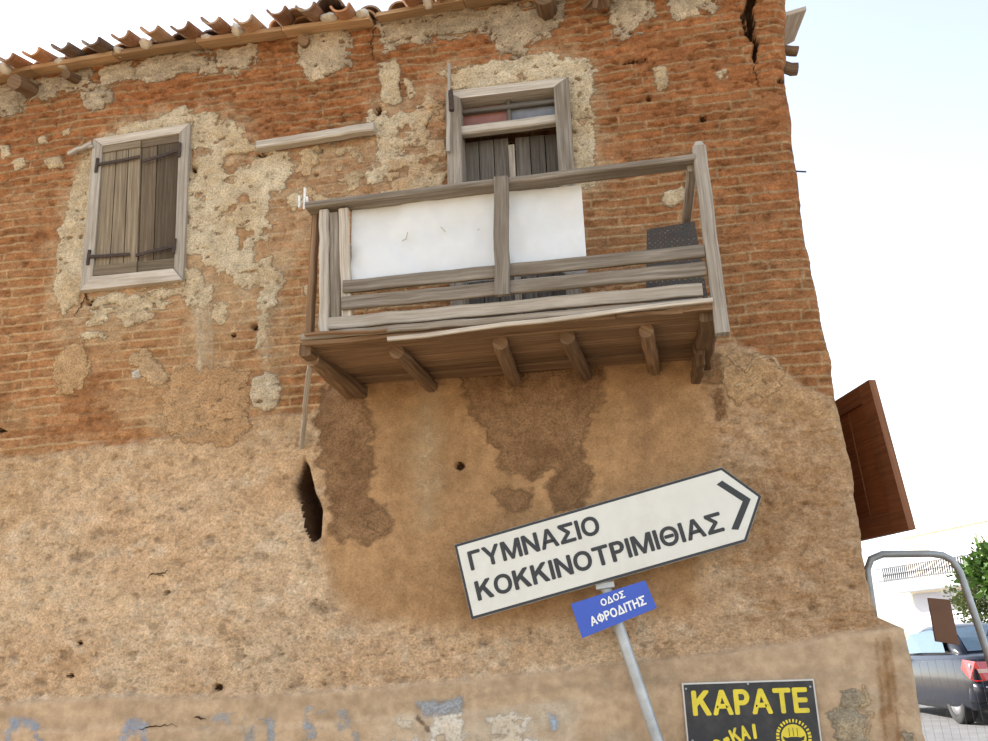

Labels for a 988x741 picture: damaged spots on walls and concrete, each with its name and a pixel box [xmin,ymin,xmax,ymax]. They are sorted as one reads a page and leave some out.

flaking render [608,0,721,41]
crack [740,0,760,87]
flaking render [0,42,258,117]
flaking render [652,66,669,91]
flaking render [0,145,26,171]
flaking render [53,0,598,349]
flaking render [662,186,685,207]
flaking render [705,352,785,421]
spalling [298,386,394,547]
crack [140,716,206,730]
peeling [396,712,466,741]
spalling [827,685,874,741]